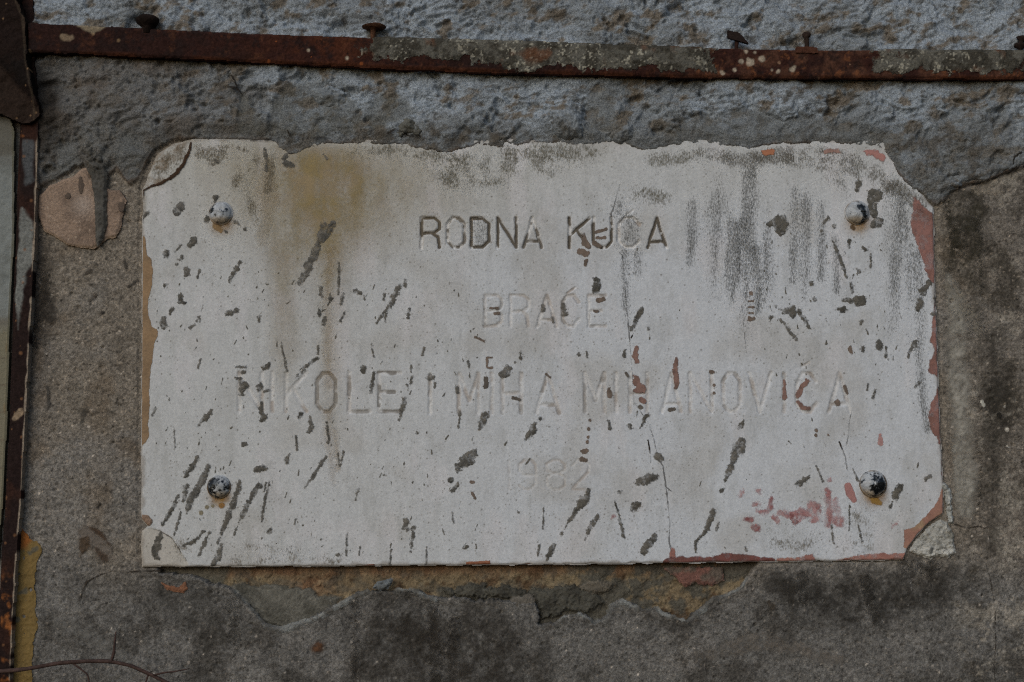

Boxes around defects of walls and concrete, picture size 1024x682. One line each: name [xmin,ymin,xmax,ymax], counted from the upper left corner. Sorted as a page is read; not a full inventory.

spalling [38,168,127,249]
spalling [160,548,815,633]